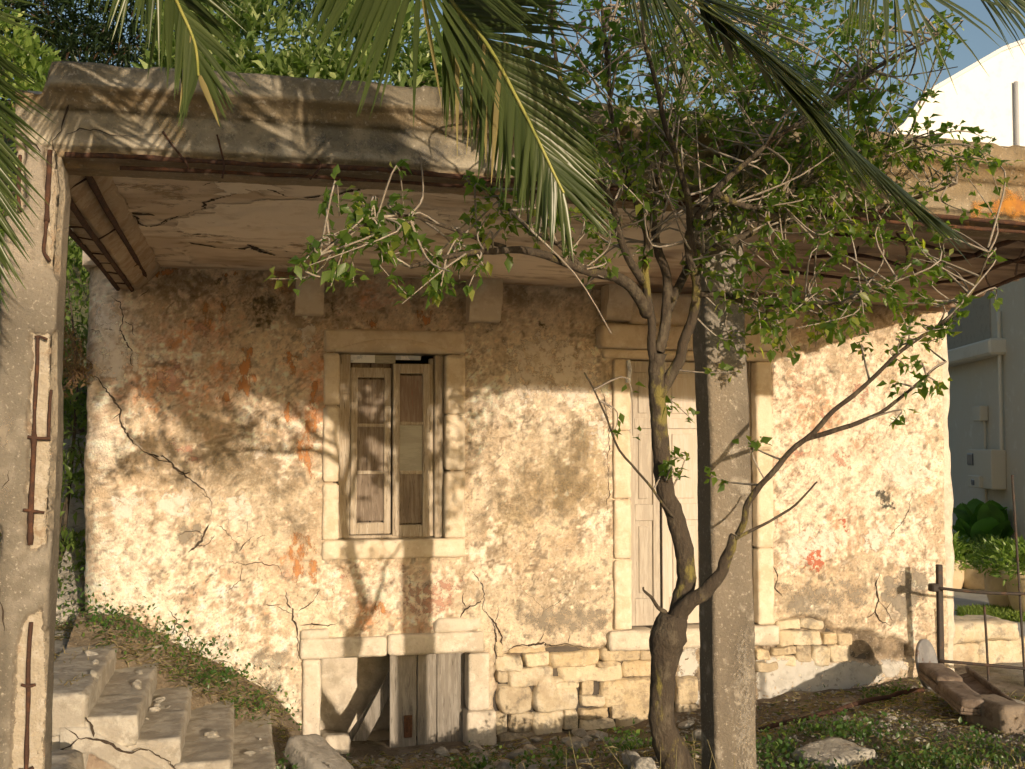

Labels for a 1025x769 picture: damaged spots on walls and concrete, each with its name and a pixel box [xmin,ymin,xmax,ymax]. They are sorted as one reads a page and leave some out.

crack [132,182,291,259]
peeling [42,131,514,263]
rust [972,190,1025,217]
peeling [110,482,193,520]
crack [92,374,337,661]
damp [498,422,588,517]
peeling [787,522,840,572]
peeling [879,441,933,490]
crack [460,570,603,667]
crack [868,574,893,625]
flaking render [729,577,867,769]
crack [60,717,175,769]